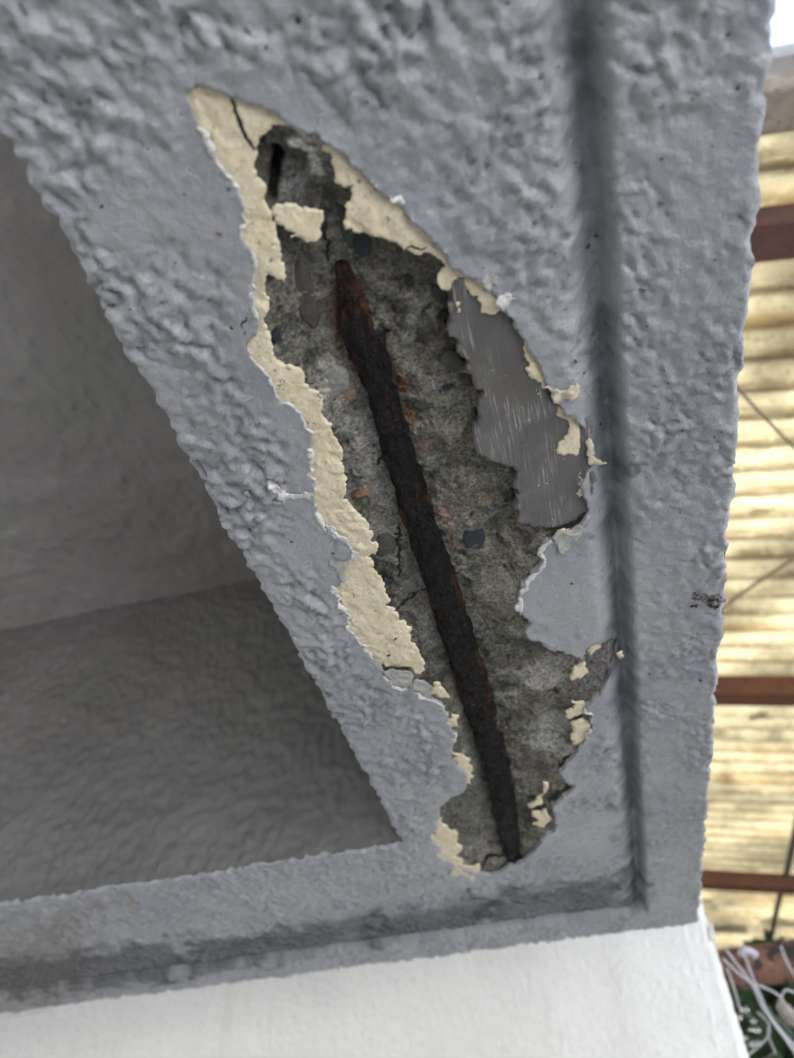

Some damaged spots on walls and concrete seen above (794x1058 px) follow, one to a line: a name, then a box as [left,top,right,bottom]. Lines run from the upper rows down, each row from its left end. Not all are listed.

spalling [188,85,624,882]